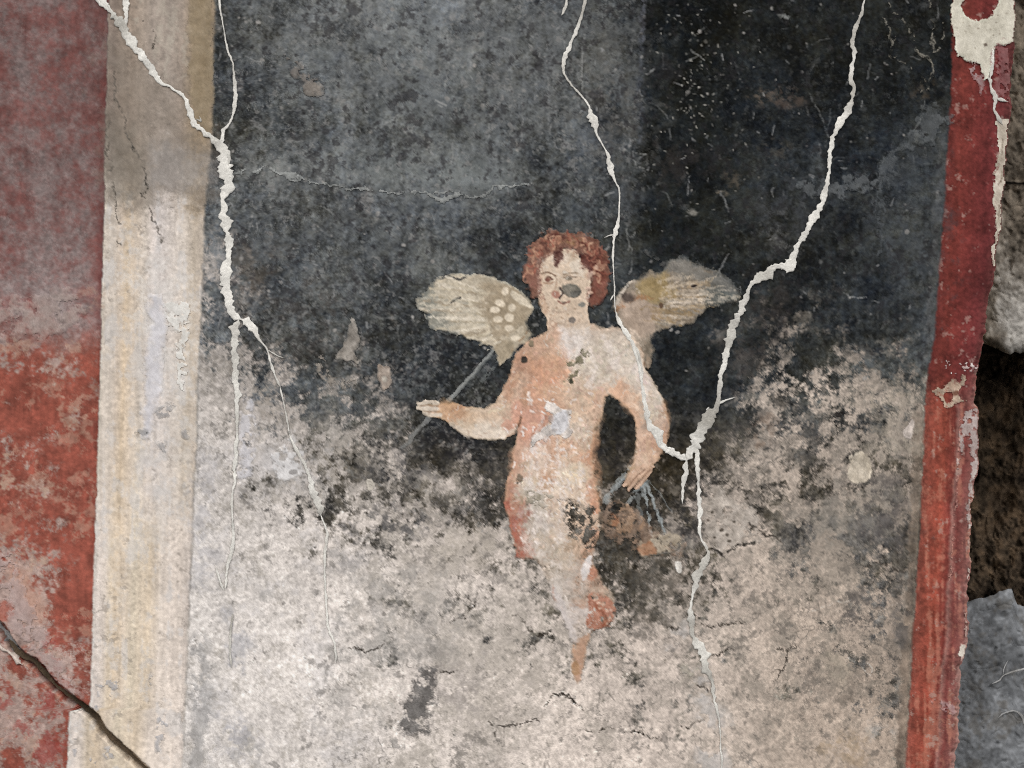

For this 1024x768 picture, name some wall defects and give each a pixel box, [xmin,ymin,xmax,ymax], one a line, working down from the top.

flaking render [991,119,1009,269]
crack [96,0,383,667]
damp [270,430,310,482]
crack [561,0,865,768]
peeling [177,297,981,768]
crack [0,622,148,768]
damp [185,633,217,768]